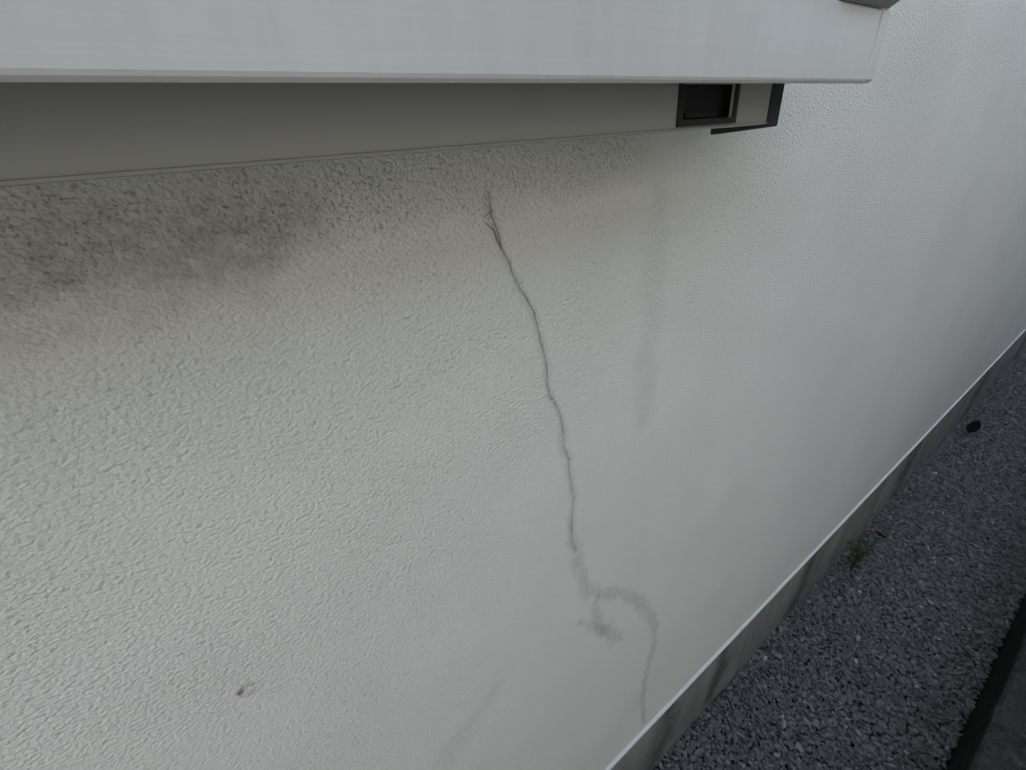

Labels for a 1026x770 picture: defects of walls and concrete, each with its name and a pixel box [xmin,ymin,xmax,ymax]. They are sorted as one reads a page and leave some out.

crack [483,201,574,541]